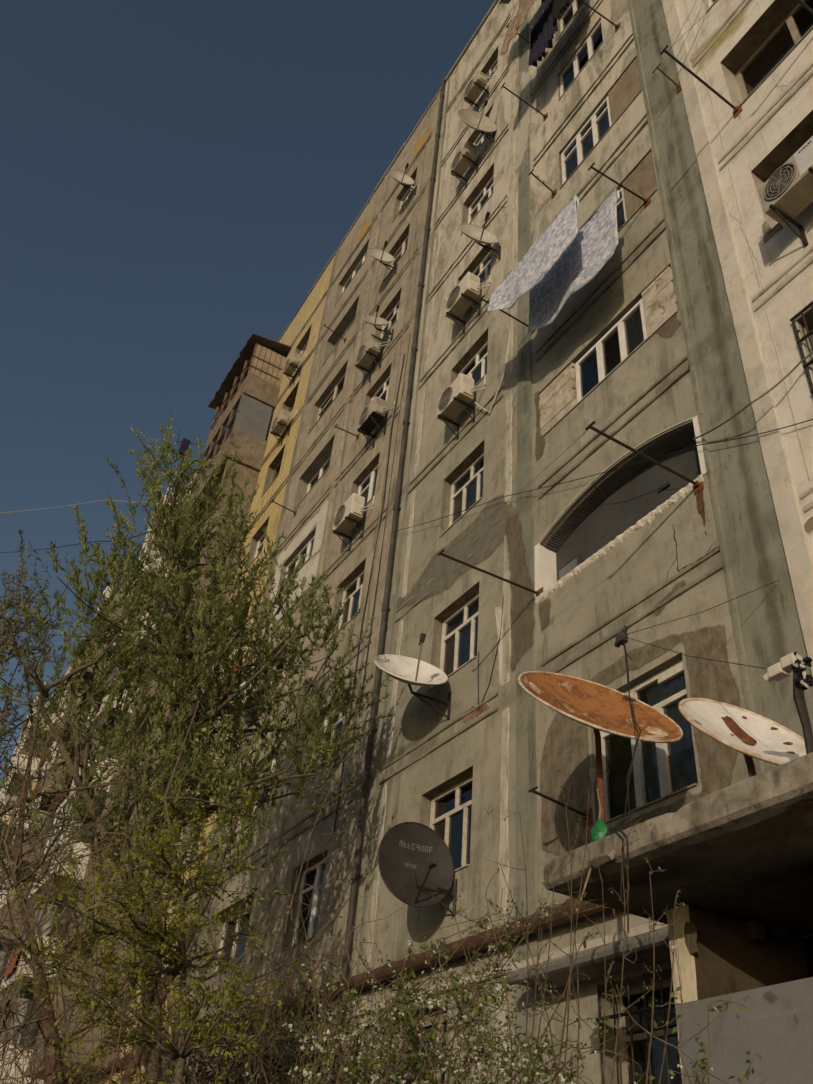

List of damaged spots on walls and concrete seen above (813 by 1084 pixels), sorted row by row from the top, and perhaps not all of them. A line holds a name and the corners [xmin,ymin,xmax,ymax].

corrosion [696,489,706,534]
spalling [804,515,813,535]
crack [666,525,719,580]